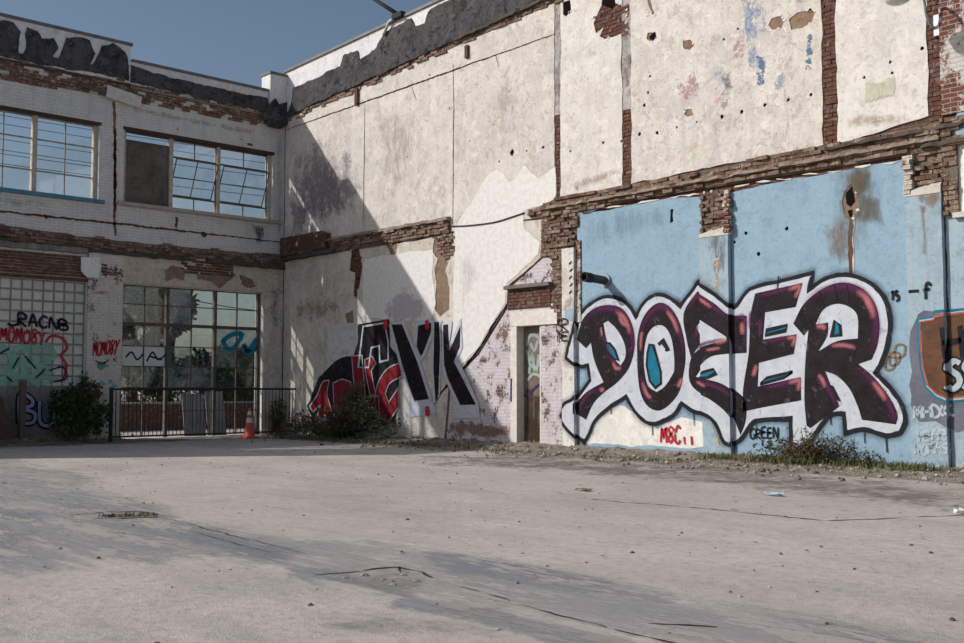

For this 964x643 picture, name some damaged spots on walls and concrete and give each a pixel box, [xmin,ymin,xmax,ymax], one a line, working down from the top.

flaking render [593,0,629,39]
peeling [723,0,816,90]
damp [291,147,356,229]
flaking render [164,265,187,281]
flaking render [197,272,256,290]
crack [88,511,306,554]
crack [317,566,432,578]